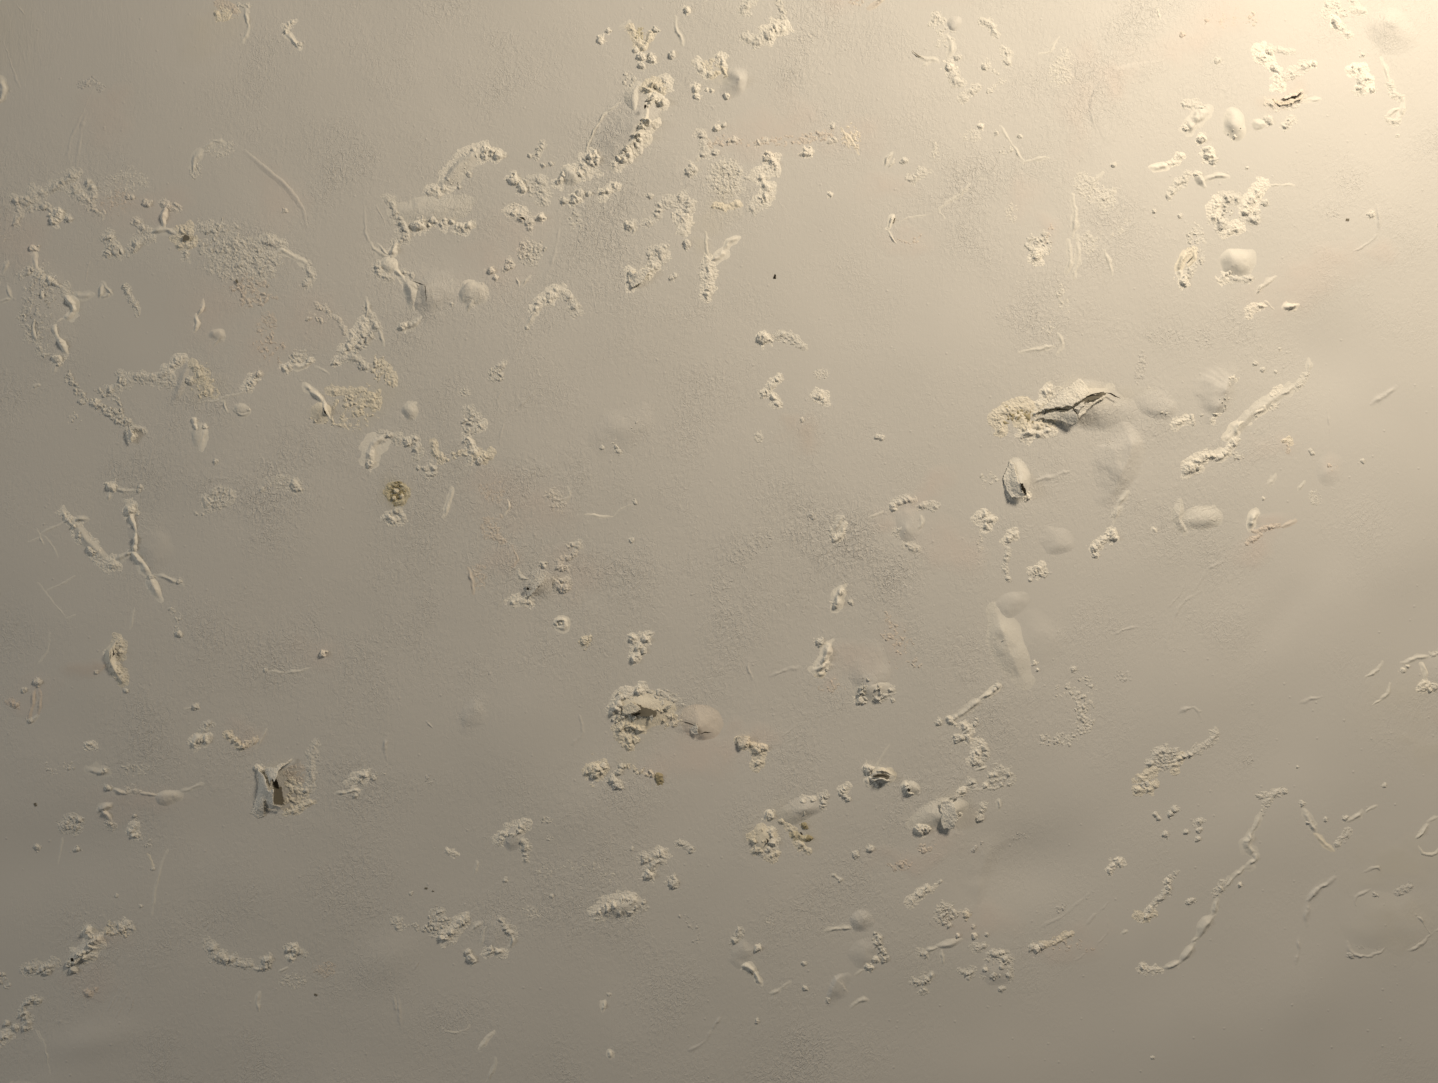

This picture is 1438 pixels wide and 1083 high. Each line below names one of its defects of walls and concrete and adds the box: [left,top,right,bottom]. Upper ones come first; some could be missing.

peeling [624,240,672,293]
peeling [277,349,331,424]
peeling [189,417,209,452]
peeling [1003,461,1027,498]
peeling [605,680,685,752]
peeling [250,737,321,818]
peeling [334,768,386,799]